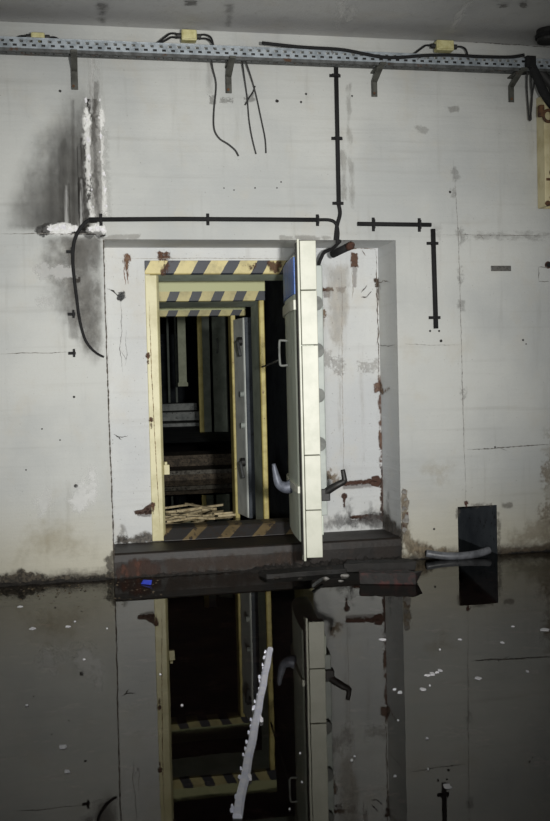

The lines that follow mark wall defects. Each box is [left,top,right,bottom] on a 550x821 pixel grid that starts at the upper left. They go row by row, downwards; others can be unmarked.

leakage [36,222,107,237]
corrosion [157,251,170,276]
corrosion [267,261,282,273]
corrosion [350,242,358,267]
corrosion [327,376,390,522]
leakage [0,532,161,584]